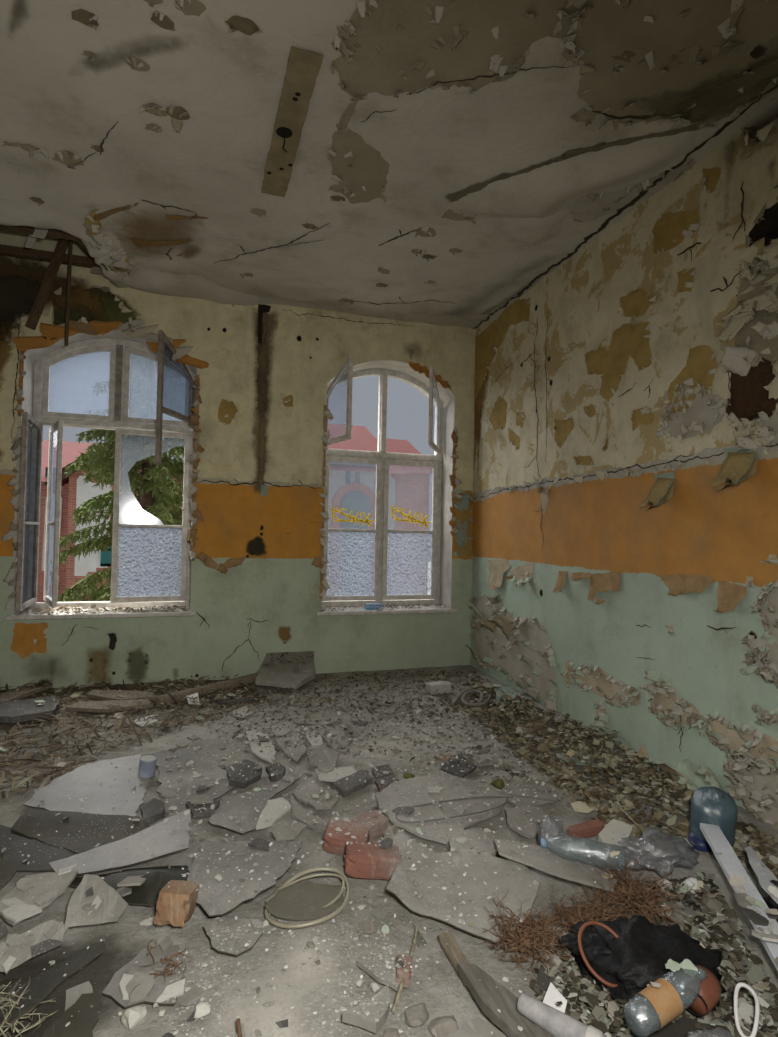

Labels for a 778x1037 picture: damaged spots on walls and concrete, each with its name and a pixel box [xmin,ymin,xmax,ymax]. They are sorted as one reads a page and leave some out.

peeling [71,9,99,30]
peeling [144,0,206,31]
peeling [224,16,262,36]
peeling [139,103,190,134]
crack [362,64,580,122]
peeling [327,0,778,204]
crack [473,86,778,329]
crack [213,223,329,264]
crack [378,228,419,246]
crack [286,297,456,327]
crack [474,308,778,546]
peeling [11,622,50,660]